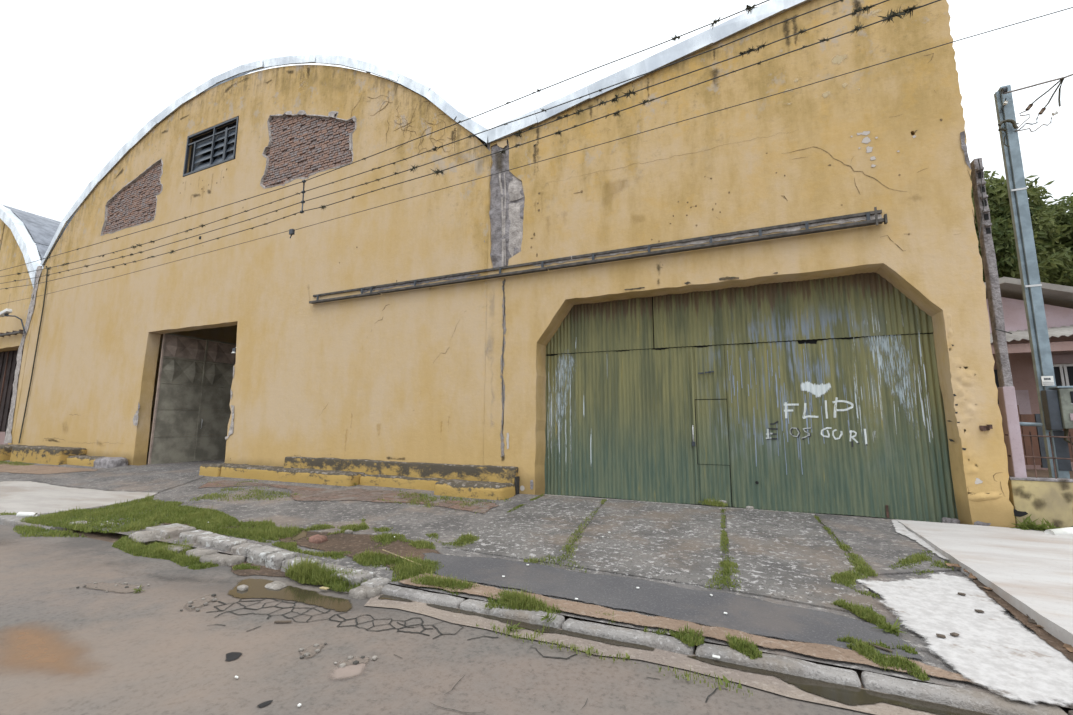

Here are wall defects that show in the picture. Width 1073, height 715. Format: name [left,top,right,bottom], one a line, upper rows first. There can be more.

flaking render [260,110,357,189]
peeling [850,131,878,167]
flaking render [100,159,163,236]
flaking render [484,139,882,268]
peeling [359,274,481,293]